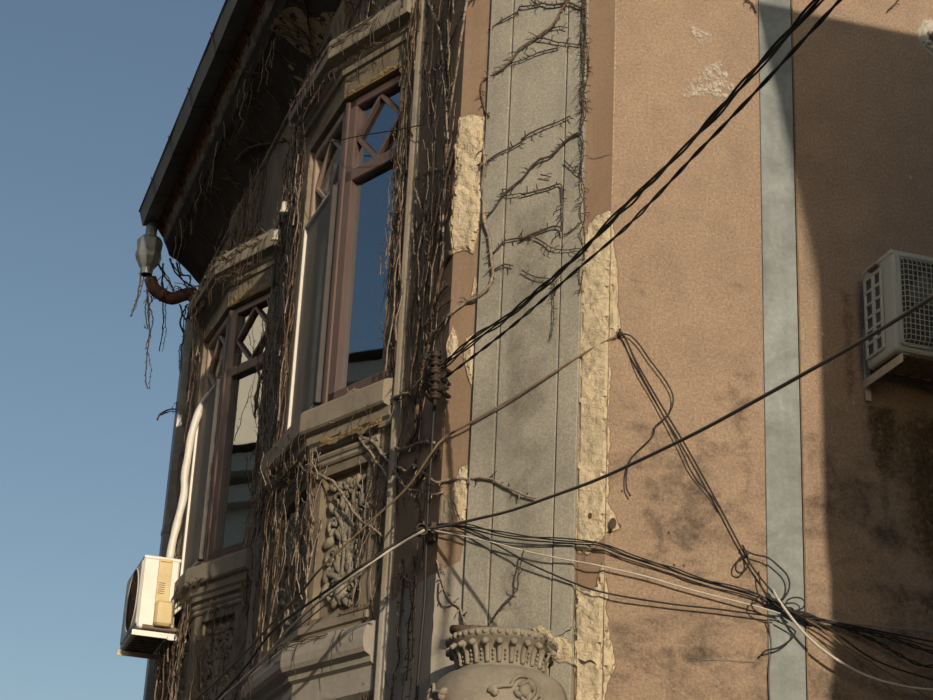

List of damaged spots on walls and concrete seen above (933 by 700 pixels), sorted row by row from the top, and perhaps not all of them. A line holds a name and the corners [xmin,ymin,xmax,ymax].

peeling [268,7,336,58]
peeling [449,113,486,254]
peeling [446,326,475,389]
peeling [575,210,622,555]
peeling [532,562,617,700]